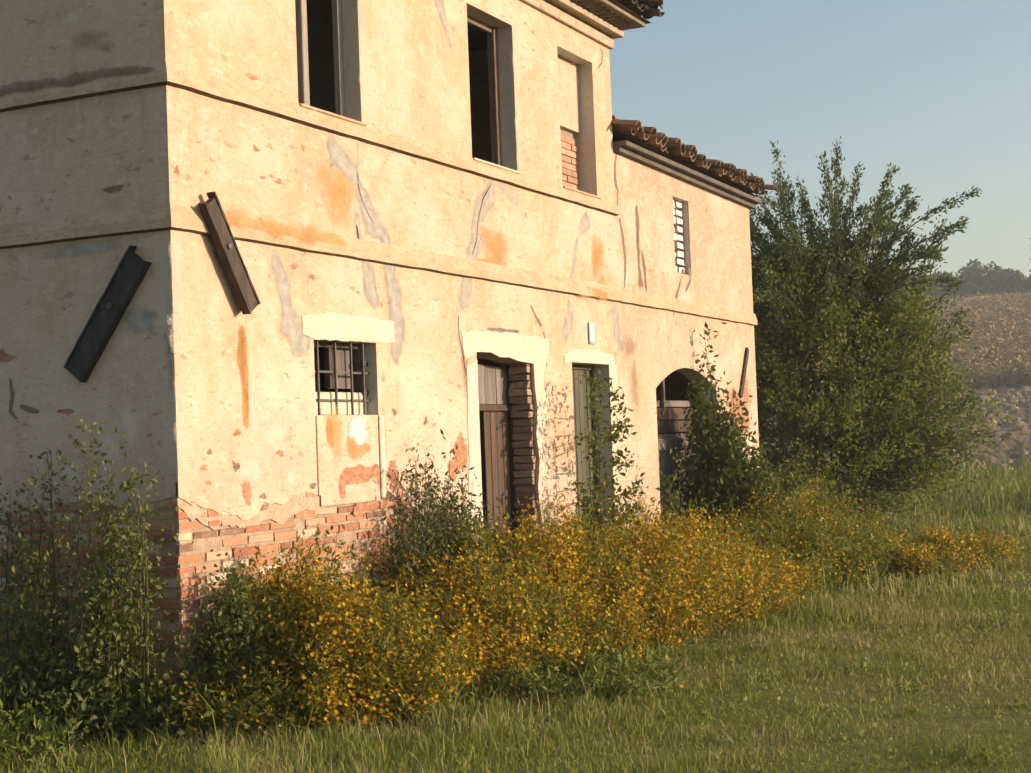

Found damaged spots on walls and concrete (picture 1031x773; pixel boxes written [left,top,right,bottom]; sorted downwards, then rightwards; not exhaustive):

damp [0,66,154,95]
crack [326,134,406,365]
crack [455,179,518,408]
crack [487,210,591,366]
corrosion [236,326,250,430]
flaking render [447,432,469,480]
flaking render [0,392,459,723]